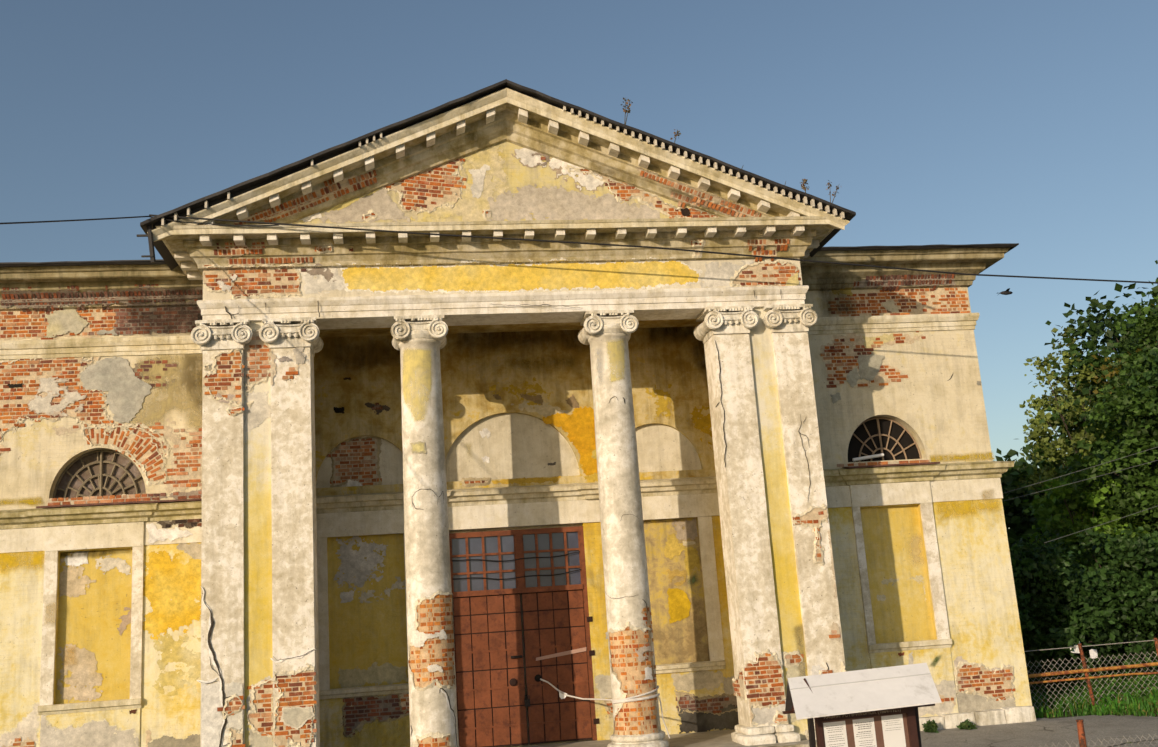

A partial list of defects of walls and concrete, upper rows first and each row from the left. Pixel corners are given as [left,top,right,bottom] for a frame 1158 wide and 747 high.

flaking render [482,148,761,221]
flaking render [0,239,801,340]
flaking render [829,273,971,317]
flaking render [0,356,202,506]
flaking render [203,329,306,433]
flaking render [820,331,926,388]
crack [197,587,232,747]
flaking render [217,663,317,747]
flaking render [338,591,456,738]
flaking render [594,606,659,736]
flaking render [671,649,804,727]
flaking render [918,656,1015,717]